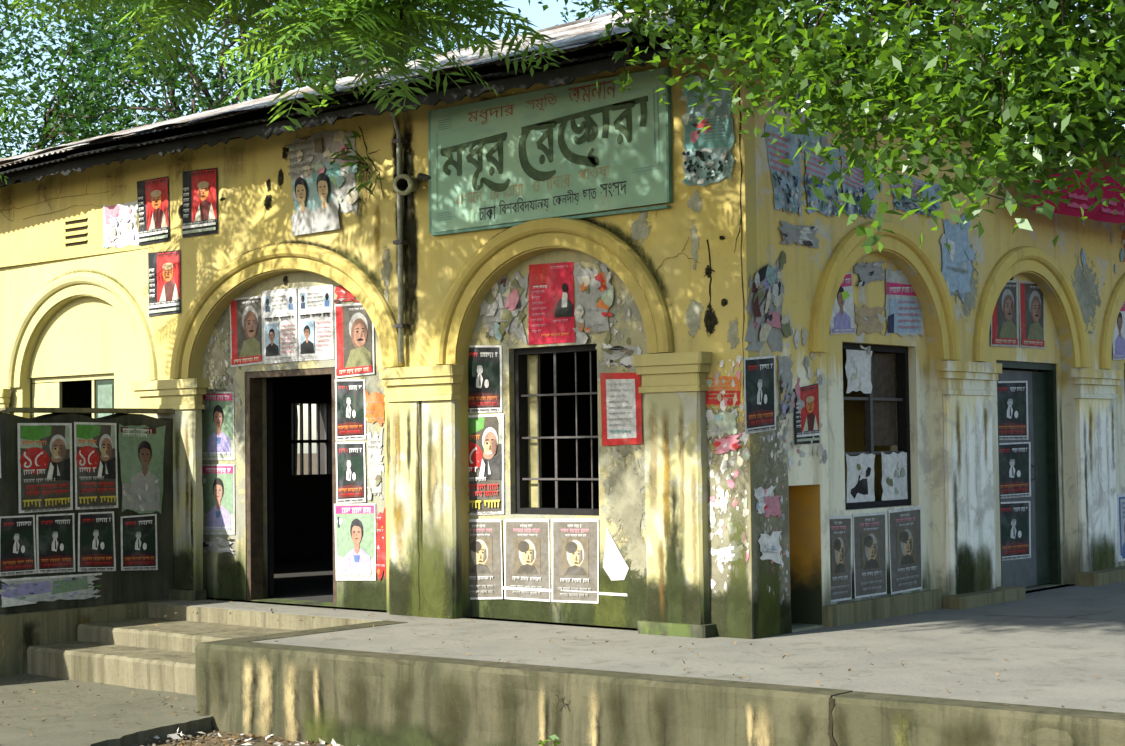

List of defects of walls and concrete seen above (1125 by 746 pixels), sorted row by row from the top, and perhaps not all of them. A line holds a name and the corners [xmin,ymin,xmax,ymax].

damp [392,129,414,180]
damp [396,192,417,331]
peeling [687,190,703,270]
peeling [685,300,703,337]
peeling [727,319,740,349]
damp [386,416,442,543]